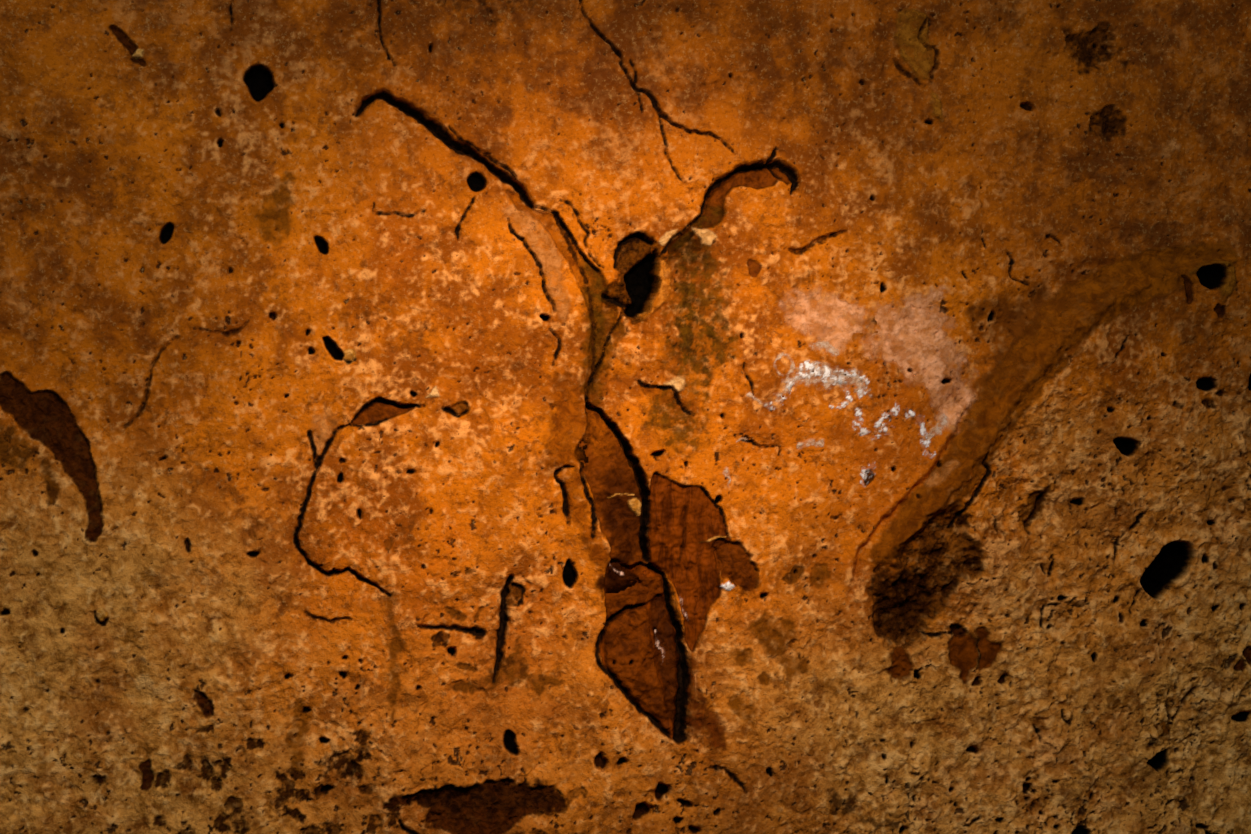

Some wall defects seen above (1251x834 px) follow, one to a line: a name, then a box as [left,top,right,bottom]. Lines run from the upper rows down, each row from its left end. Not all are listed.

crack [579,0,799,225]
crack [355,0,652,565]
flaking render [0,372,104,542]
crack [294,424,390,597]
flaking render [506,191,767,743]
crack [638,377,691,415]
crack [743,362,754,392]
leakage [747,342,947,455]
crack [417,576,561,698]
flaking render [275,729,372,834]
flaking render [361,778,587,834]
spalling [504,730,518,755]